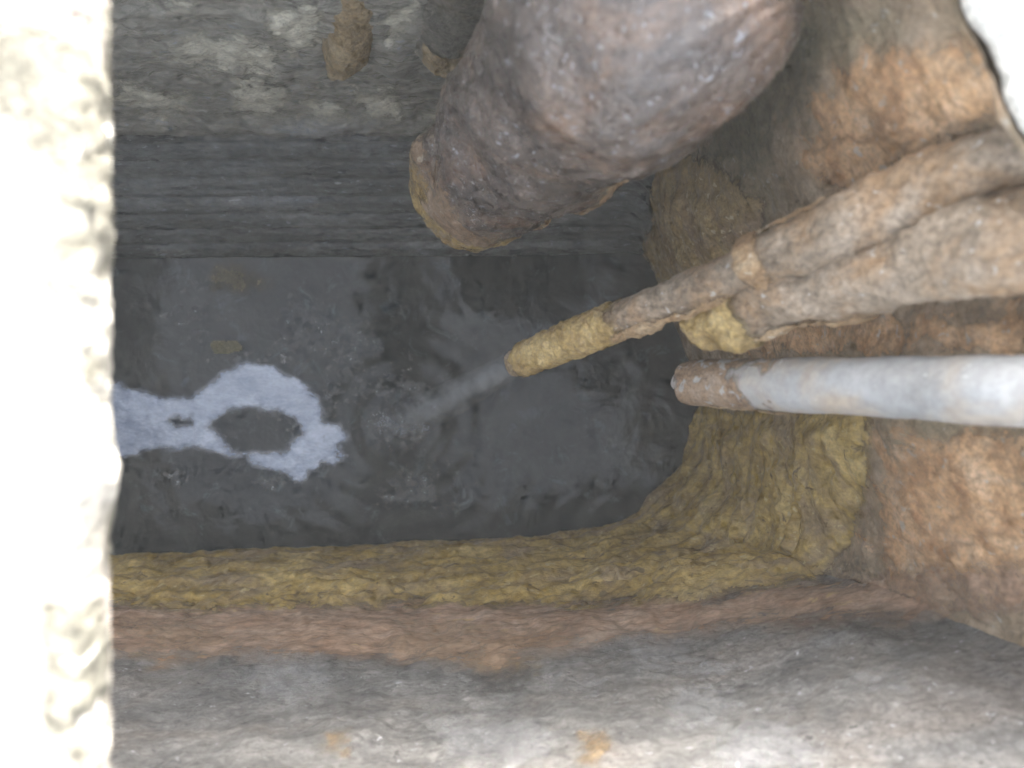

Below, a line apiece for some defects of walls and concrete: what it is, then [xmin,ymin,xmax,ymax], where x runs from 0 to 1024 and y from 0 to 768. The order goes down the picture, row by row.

water stain [109,406,869,613]